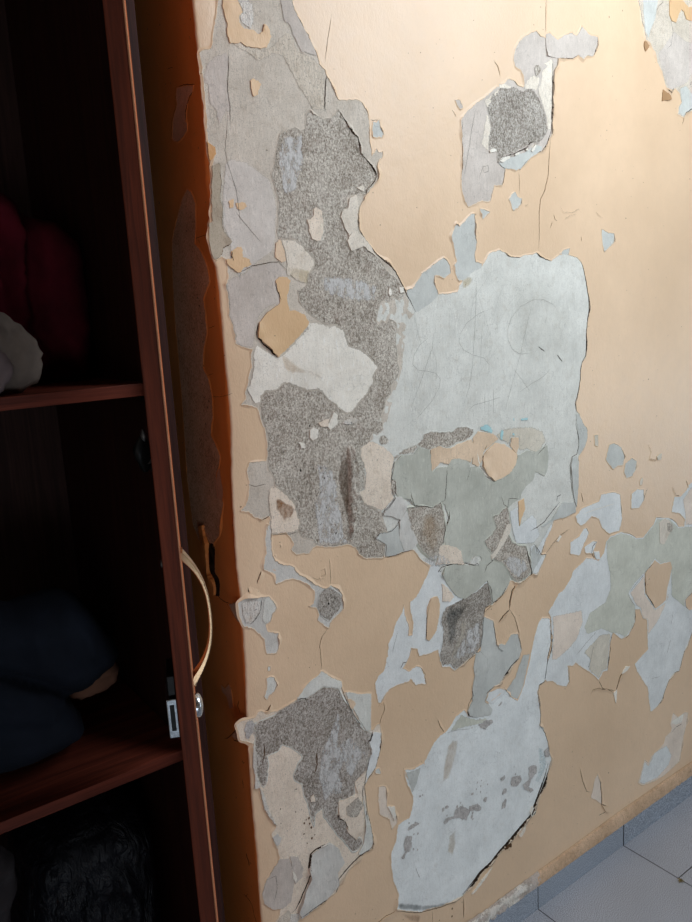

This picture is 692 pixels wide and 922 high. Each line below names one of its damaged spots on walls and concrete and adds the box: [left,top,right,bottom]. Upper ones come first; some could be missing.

peeling [171,0,692,922]